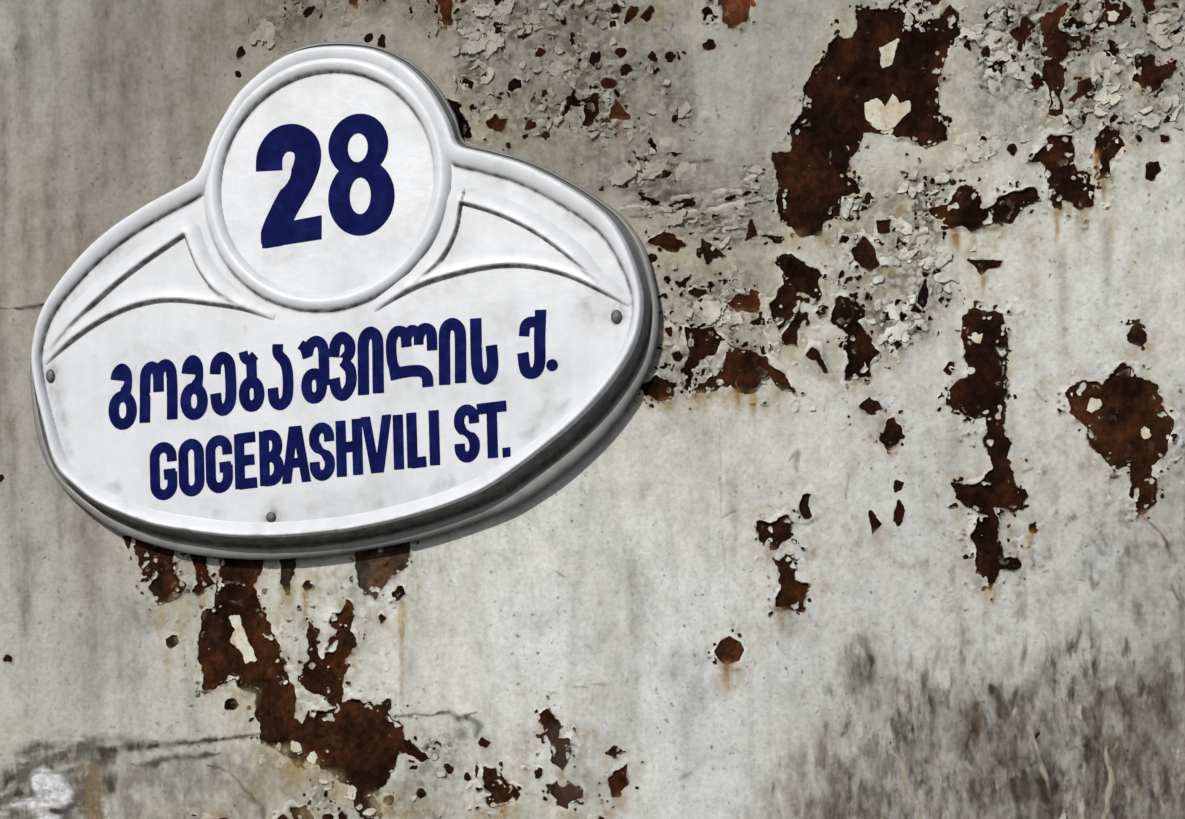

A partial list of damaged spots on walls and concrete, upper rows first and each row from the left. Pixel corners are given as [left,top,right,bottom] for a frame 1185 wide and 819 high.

peeling [232,0,351,80]
peeling [364,33,386,48]
peeling [407,0,777,249]
peeling [953,127,1046,162]
peeling [959,0,1185,146]
peeling [1145,161,1161,182]
peeling [760,233,784,244]
peeling [655,260,766,390]
rust [627,0,1185,633]
rust [112,531,442,819]
rust [694,615,765,686]
rust [465,688,646,819]